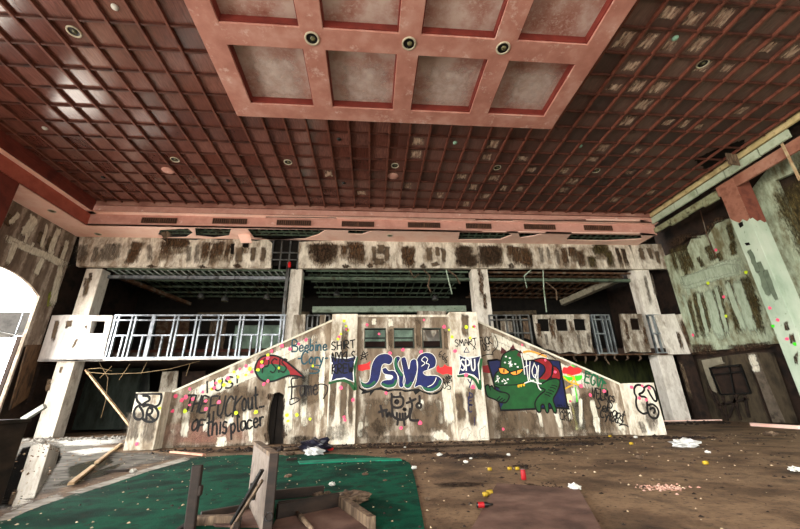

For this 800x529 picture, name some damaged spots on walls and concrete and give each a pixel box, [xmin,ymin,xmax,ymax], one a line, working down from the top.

water stain [230,243,266,263]
water stain [307,242,339,266]
water stain [371,245,390,265]
water stain [426,244,503,267]
water stain [538,247,560,264]
water stain [669,224,737,276]
water stain [682,250,778,339]
water stain [461,314,469,337]
water stain [341,327,352,357]
water stain [192,359,258,401]
water stain [267,337,368,438]
water stain [439,384,477,426]